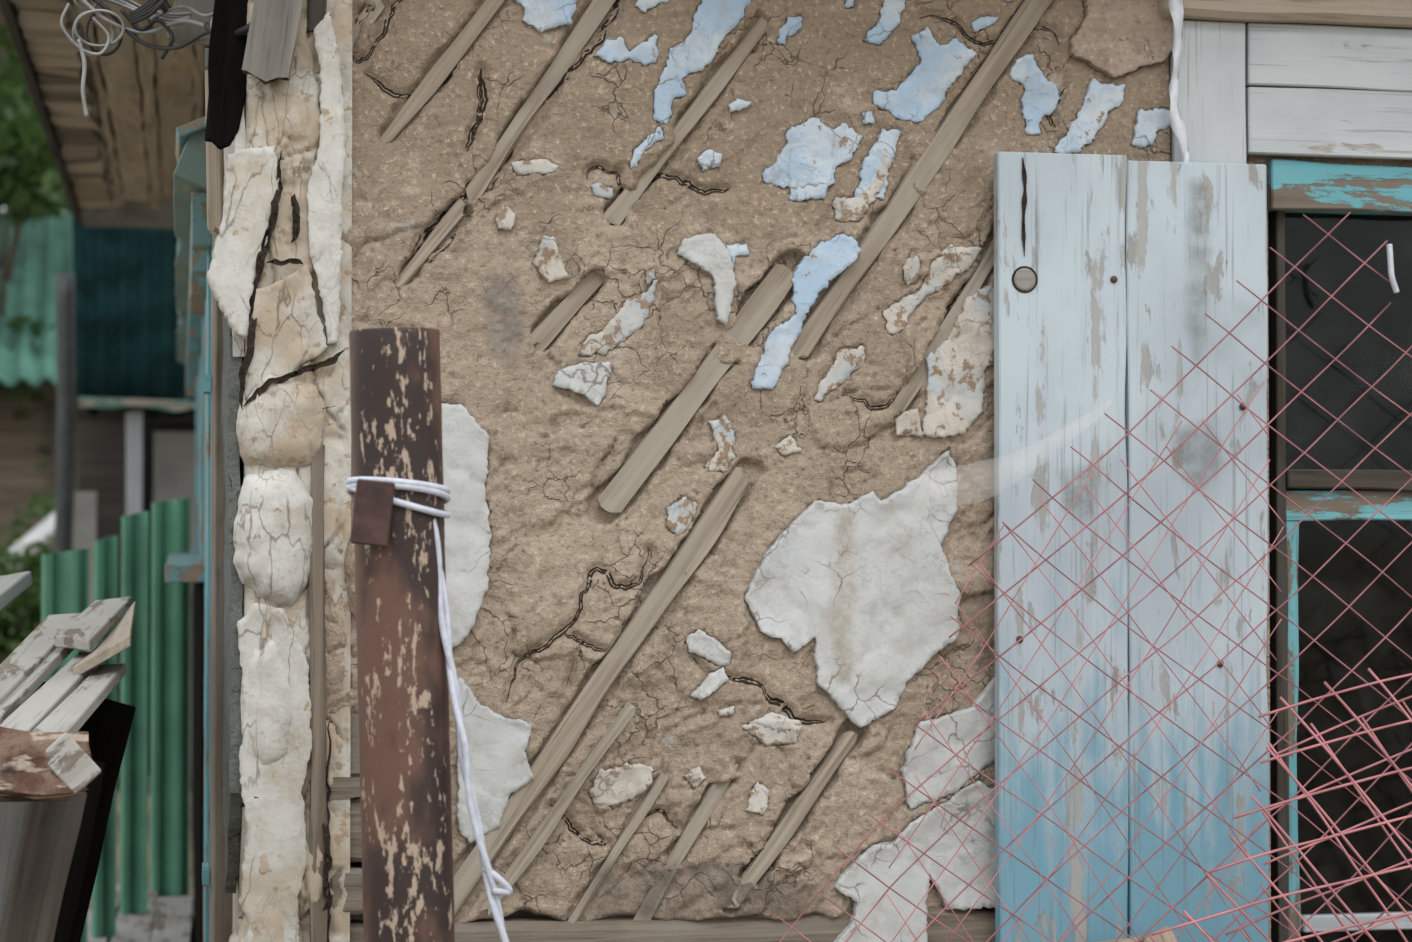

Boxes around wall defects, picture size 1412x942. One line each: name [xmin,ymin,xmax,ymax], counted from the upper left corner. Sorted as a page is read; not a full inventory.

peeling [206,11,347,400]
crack [238,150,344,410]
crack [352,0,488,152]
crack [411,150,513,262]
crack [542,0,620,105]
crack [587,165,729,196]
peeling [593,0,751,171]
peeling [750,0,1013,390]
crack [1020,157,1028,257]
peeling [442,403,492,648]
peeling [744,285,994,728]
peeling [834,676,995,942]